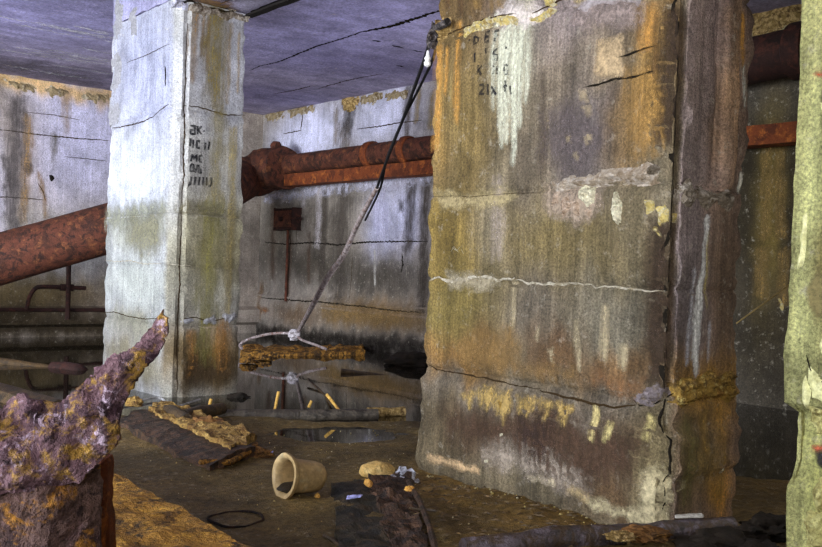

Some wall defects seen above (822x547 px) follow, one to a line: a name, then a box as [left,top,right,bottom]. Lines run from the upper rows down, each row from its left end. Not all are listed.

crack [249,10,439,94]
crack [437,0,561,38]
damp [463,0,557,116]
crack [585,45,657,87]
damp [3,98,32,228]
damp [106,202,190,266]
rust [183,324,234,387]
damp [300,334,418,353]
damp [265,178,514,330]
crack [425,363,635,409]
crack [658,55,679,510]
damp [644,200,740,408]